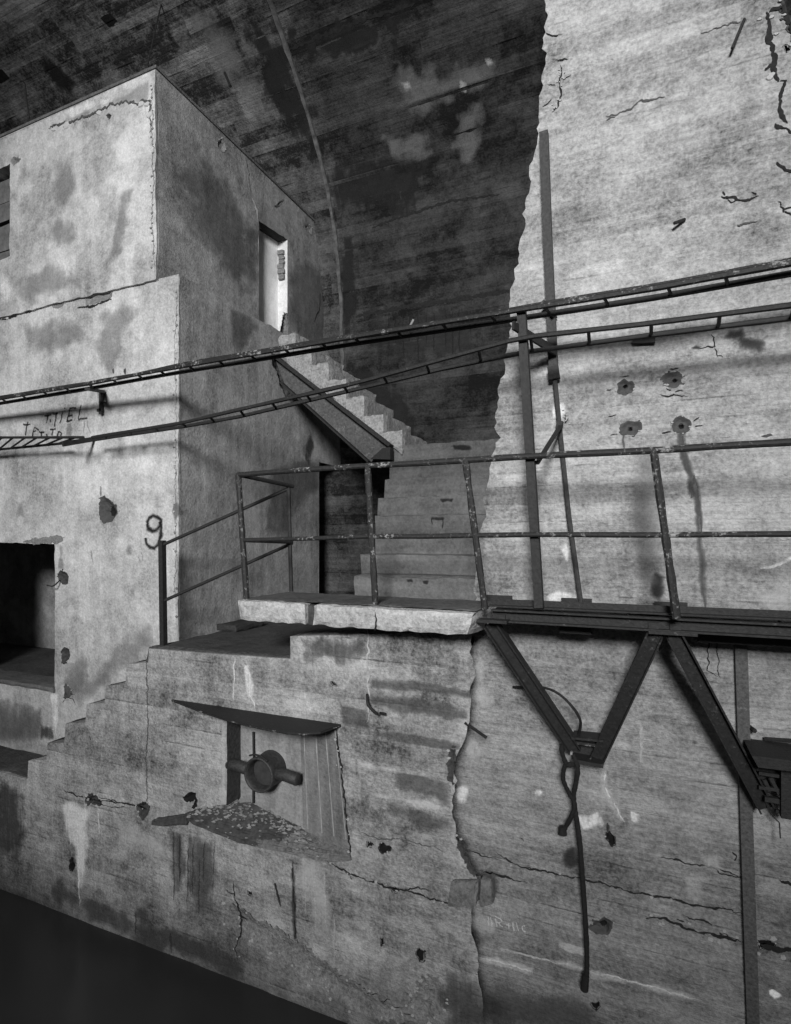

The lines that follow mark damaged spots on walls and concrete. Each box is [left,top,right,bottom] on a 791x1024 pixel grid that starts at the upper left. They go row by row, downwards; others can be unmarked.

crack [544,33,569,112]
crack [702,0,791,133]
crack [607,96,665,120]
water stain [0,274,12,301]
spalling [607,375,635,395]
spalling [660,368,688,392]
spalling [608,415,642,447]
spalling [662,415,702,434]
spalling [98,486,120,525]
crack [327,728,448,904]
water stain [54,802,239,974]
crack [472,851,791,960]